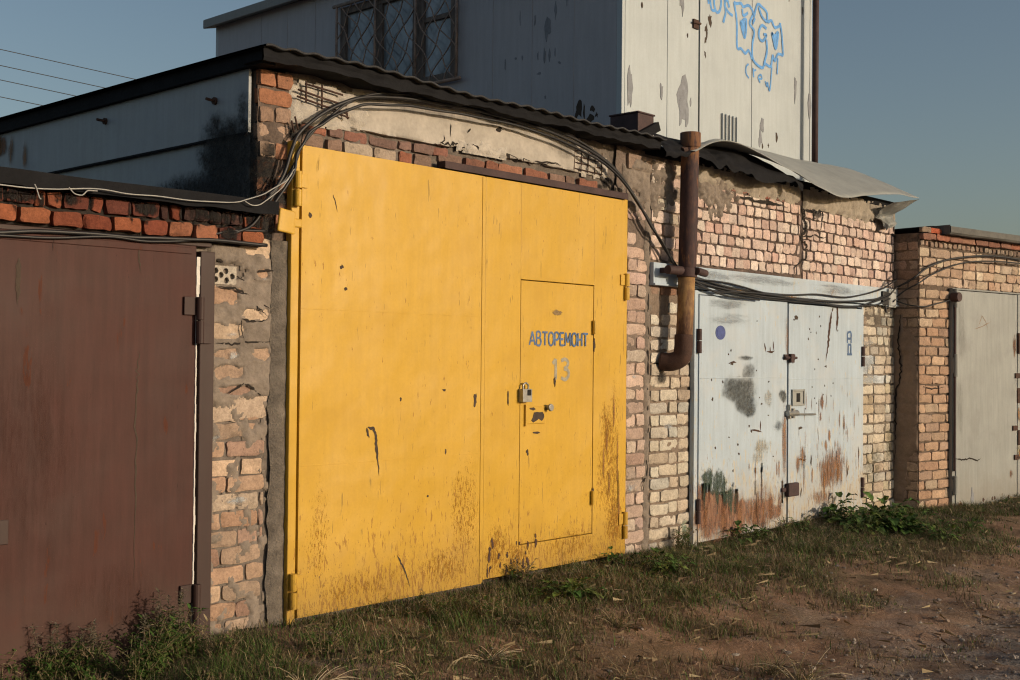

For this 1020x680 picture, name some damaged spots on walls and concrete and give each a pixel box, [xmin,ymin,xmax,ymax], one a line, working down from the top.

spalling [456,139,507,160]
peeling [575,100,598,122]
spalling [574,149,608,179]
crack [739,193,826,275]
flaking render [208,245,272,564]
crack [894,315,943,460]
rust [596,387,622,545]
rust [693,396,859,541]
rust [304,460,478,613]
rust [486,527,596,579]
flaking render [210,576,267,640]